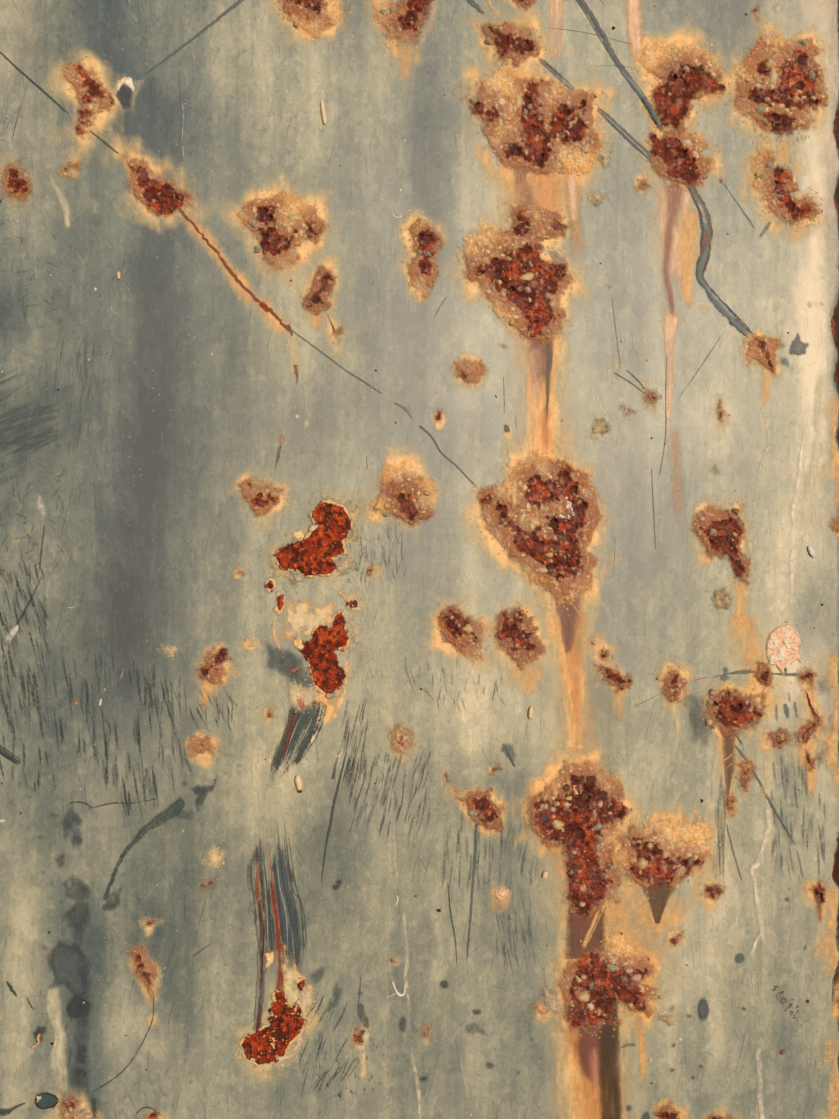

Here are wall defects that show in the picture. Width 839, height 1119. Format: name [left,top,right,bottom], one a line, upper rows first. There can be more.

rust [226,175,344,353]
rust [623,0,839,425]
rust [831,293,839,478]
rust [363,448,443,529]
rust [399,0,727,1119]
rust [656,495,839,816]
rust [771,986,800,1018]
rust [803,832,839,1029]
rust [702,1110,733,1119]